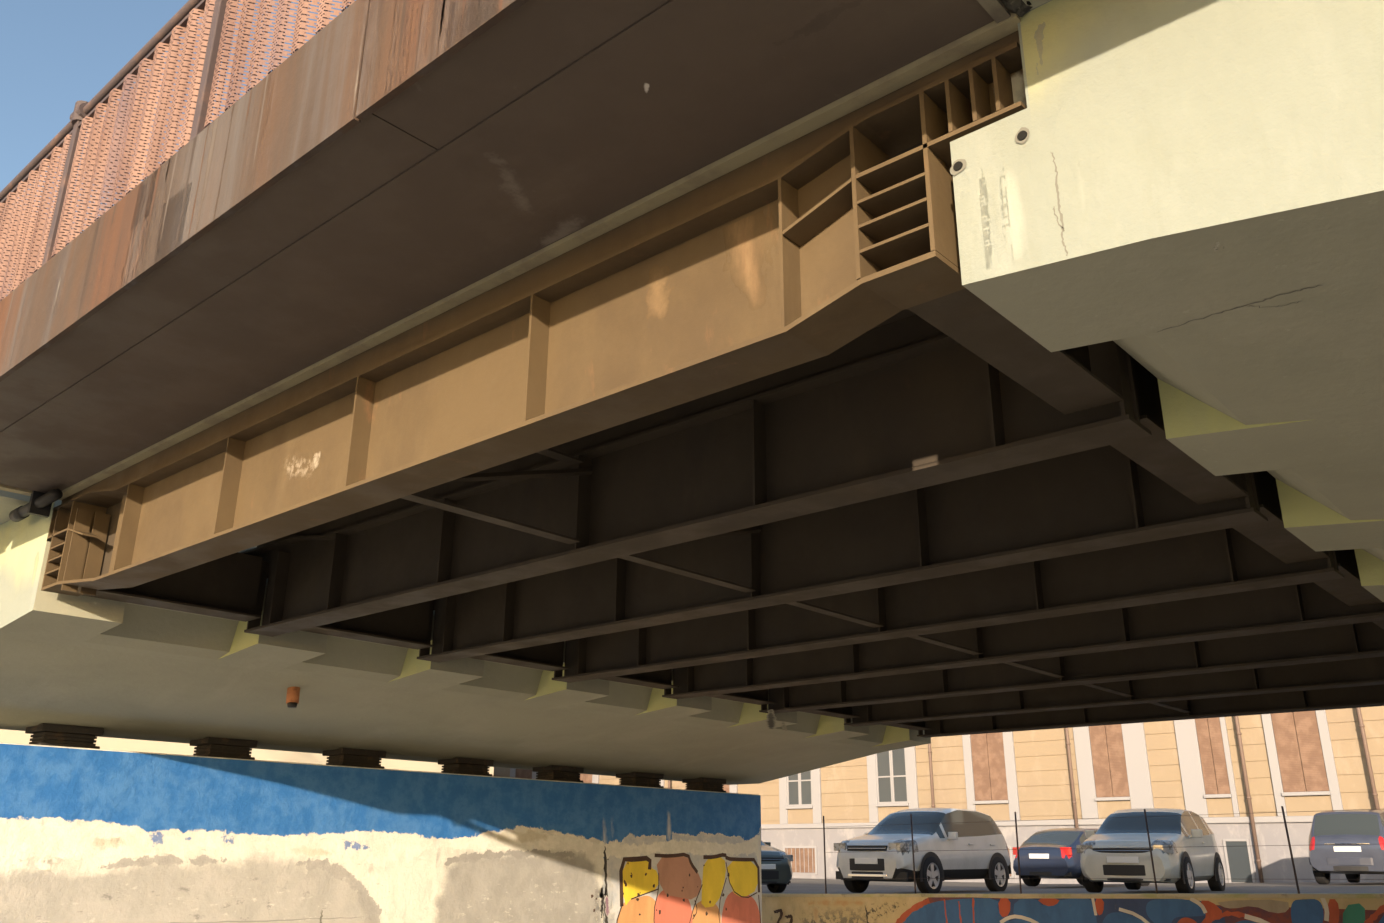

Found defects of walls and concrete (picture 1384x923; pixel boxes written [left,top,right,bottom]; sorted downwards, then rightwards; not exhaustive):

rust [362,0,445,108]
spalling [1001,0,1032,17]
rust [77,163,170,320]
rust [0,277,30,376]
crack [1158,285,1320,332]